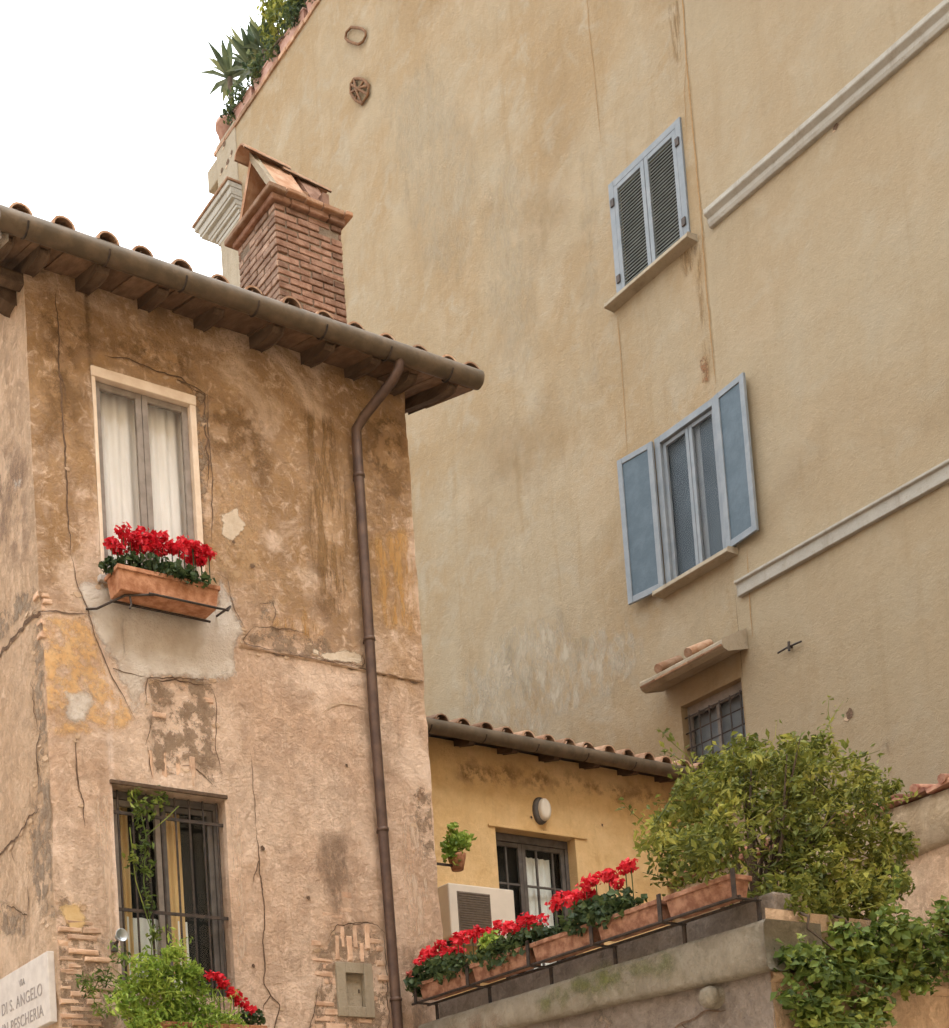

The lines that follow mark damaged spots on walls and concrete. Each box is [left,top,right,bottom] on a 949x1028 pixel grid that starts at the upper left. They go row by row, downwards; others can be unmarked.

crack [682,0,715,375]
crack [0,297,144,718]
crack [104,355,213,539]
flaking render [73,575,365,786]
crack [0,806,40,863]
flaking render [0,589,116,1028]
crack [251,759,284,1028]
water stain [323,838,345,905]
flaking render [310,922,390,1028]